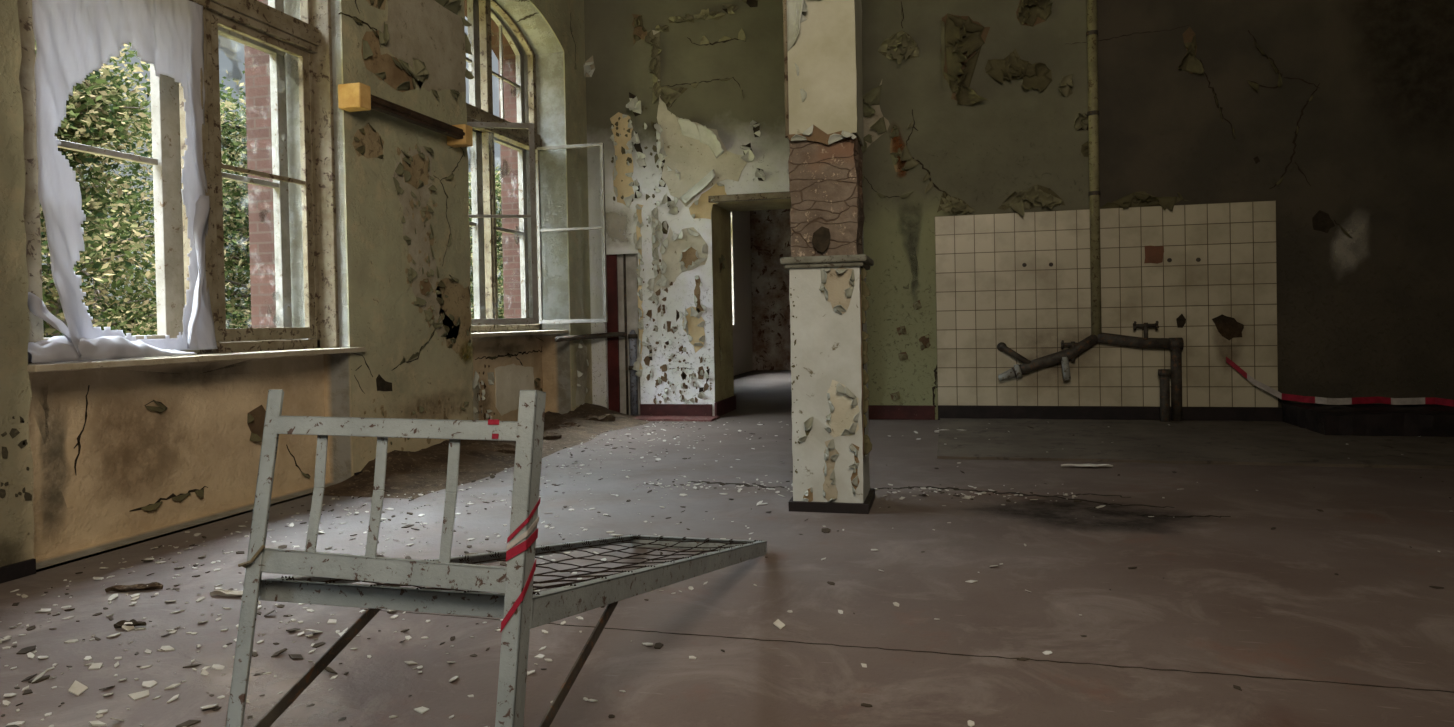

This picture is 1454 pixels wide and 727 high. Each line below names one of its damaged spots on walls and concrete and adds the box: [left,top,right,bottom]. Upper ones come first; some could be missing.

flaking render [361,0,474,100]
peeling [787,0,808,52]
peeling [940,13,1074,105]
peeling [1016,0,1053,27]
peeling [1074,112,1089,157]
peeling [610,13,766,404]
flaking render [352,123,495,420]
flaking render [788,81,890,503]
peeling [1,416,28,459]
crack [74,385,90,475]
peeling [0,467,32,501]